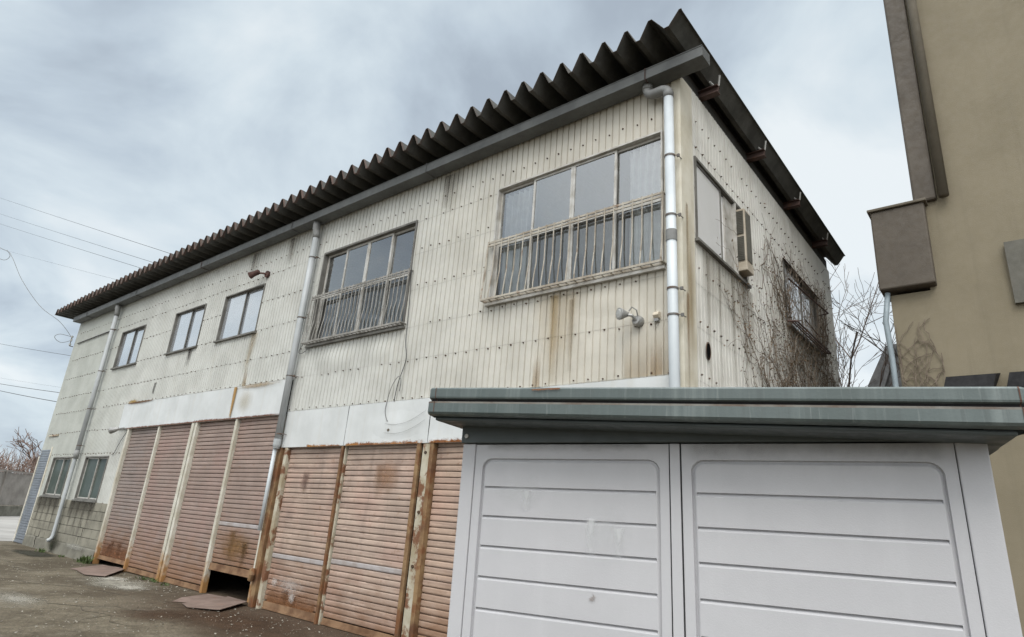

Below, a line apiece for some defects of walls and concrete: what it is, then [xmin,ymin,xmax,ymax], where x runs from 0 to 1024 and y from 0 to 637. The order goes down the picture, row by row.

corrosion [126,383,276,429]